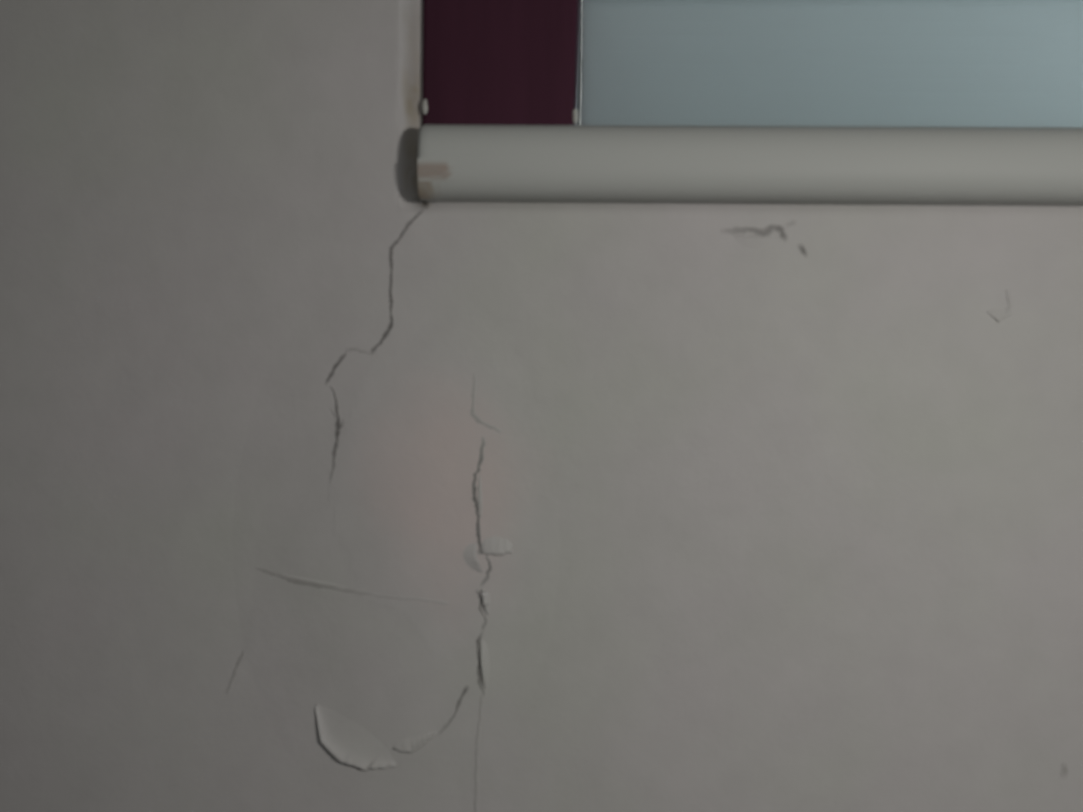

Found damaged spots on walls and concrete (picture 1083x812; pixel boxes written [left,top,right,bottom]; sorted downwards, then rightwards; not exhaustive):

crack [325,208,426,484]
crack [436,374,513,812]